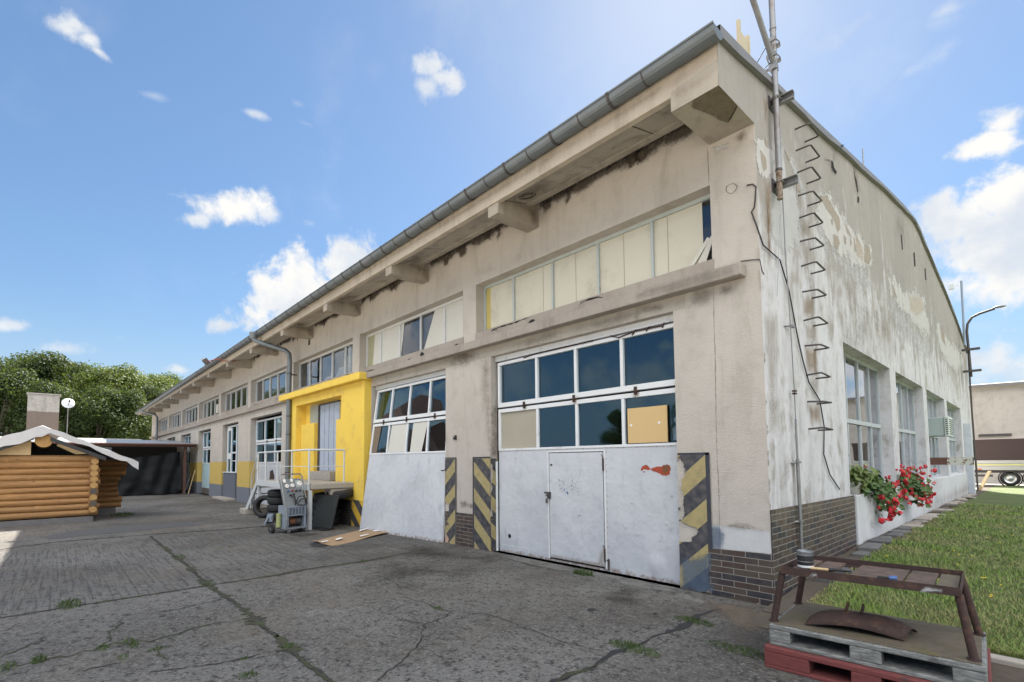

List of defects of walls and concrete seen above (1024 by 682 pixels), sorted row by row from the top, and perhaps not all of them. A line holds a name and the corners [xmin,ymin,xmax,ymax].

water stain [341,279,404,303]
water stain [416,224,508,266]
water stain [530,124,693,217]
peeling [754,136,873,287]
peeling [887,271,964,375]